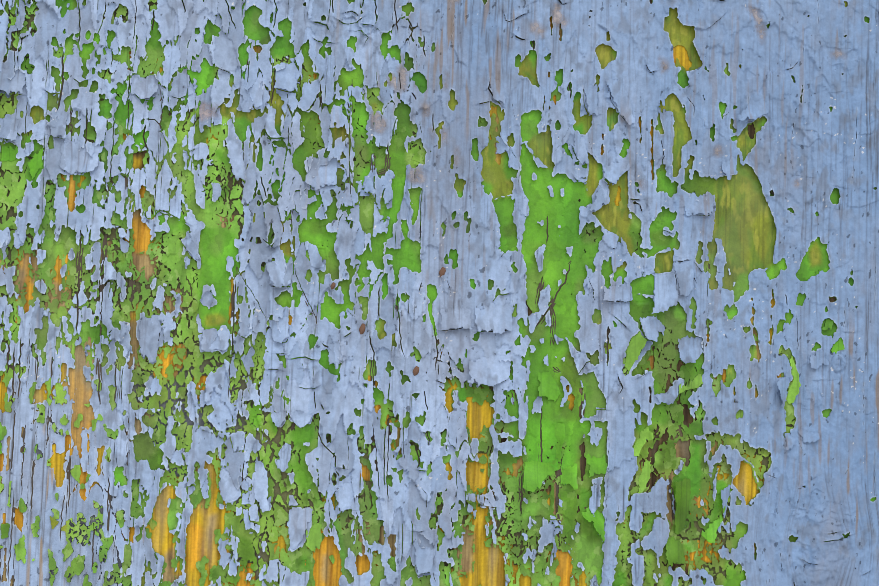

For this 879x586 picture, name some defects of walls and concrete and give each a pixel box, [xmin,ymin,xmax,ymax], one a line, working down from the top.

peeling [511,30,551,88]
peeling [595,31,617,69]
peeling [649,0,732,88]
peeling [0,0,435,586]
peeling [400,69,787,586]
peeling [796,237,830,281]